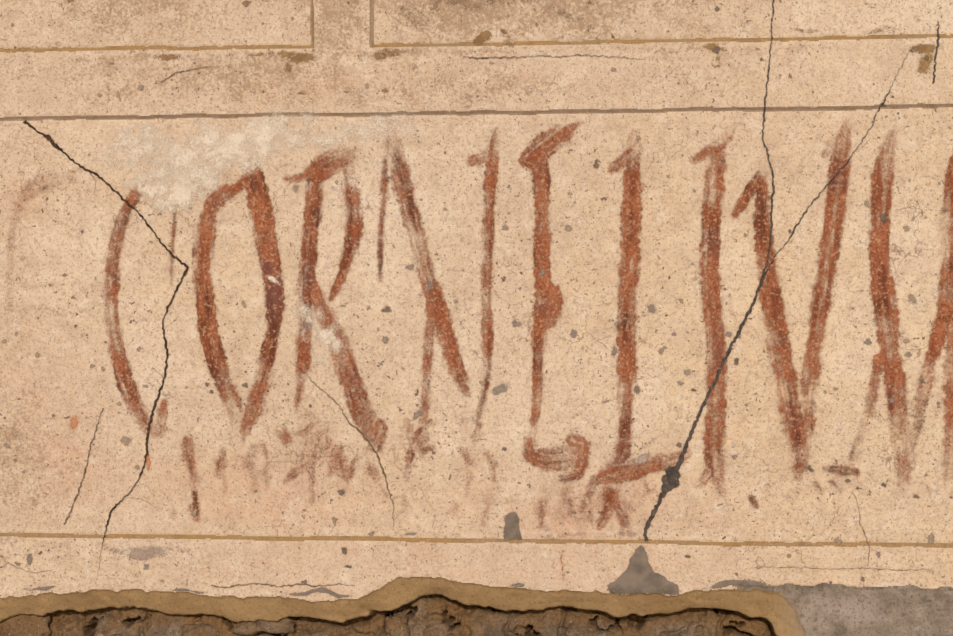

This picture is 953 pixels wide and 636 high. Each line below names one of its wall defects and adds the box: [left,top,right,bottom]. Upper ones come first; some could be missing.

crack [932,21,940,83]
crack [23,120,189,544]
crack [643,0,890,541]
spalling [0,577,807,636]